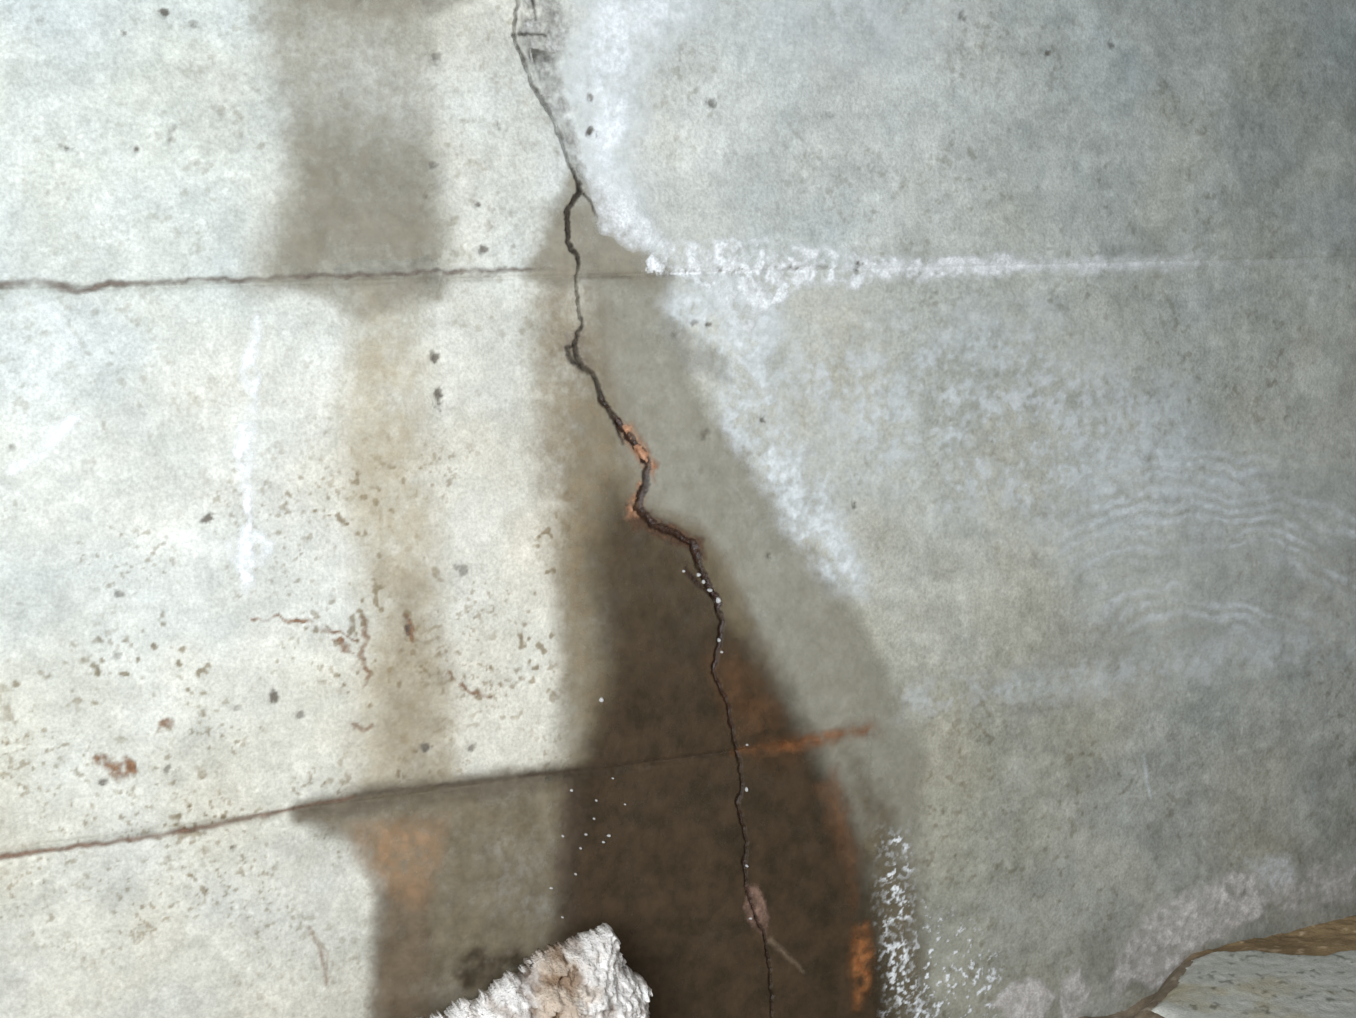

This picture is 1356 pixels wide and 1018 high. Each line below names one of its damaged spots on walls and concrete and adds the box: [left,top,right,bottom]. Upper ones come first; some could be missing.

crack [512,0,544,105]
crack [51,281,145,293]
crack [185,275,245,283]
crack [297,268,534,279]
water stain [275,0,1199,1018]
crack [558,134,772,1012]
crack [247,797,353,818]
crack [0,826,211,859]
corrosion [852,926,871,1001]